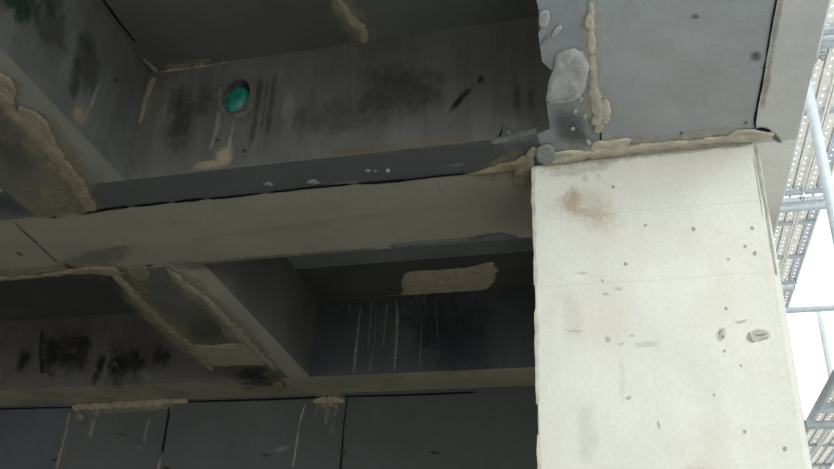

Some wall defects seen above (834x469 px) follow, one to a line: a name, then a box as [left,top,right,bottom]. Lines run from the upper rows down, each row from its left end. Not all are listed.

crack [754,0,781,143]